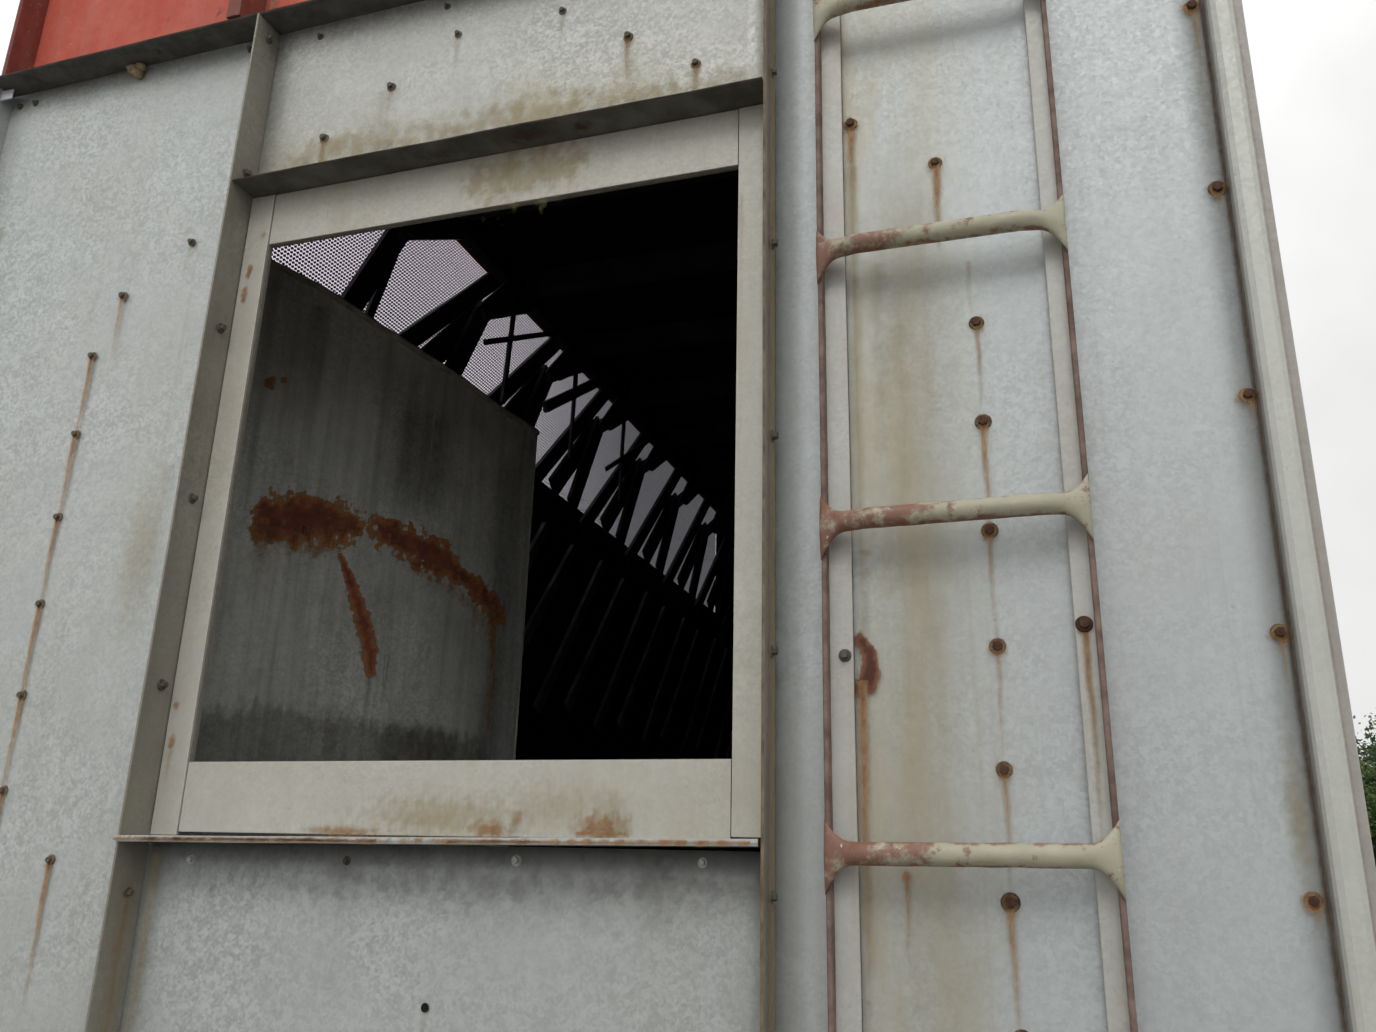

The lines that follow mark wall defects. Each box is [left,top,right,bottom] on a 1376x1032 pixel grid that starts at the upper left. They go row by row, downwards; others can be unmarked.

rust [928,157,941,220]
rust [978,421,989,497]
rust [0,357,94,809]
rust [247,486,505,730]
rust [854,632,881,842]
rust [1000,767,1011,823]
rust [32,857,53,952]
rust [1005,897,1018,997]